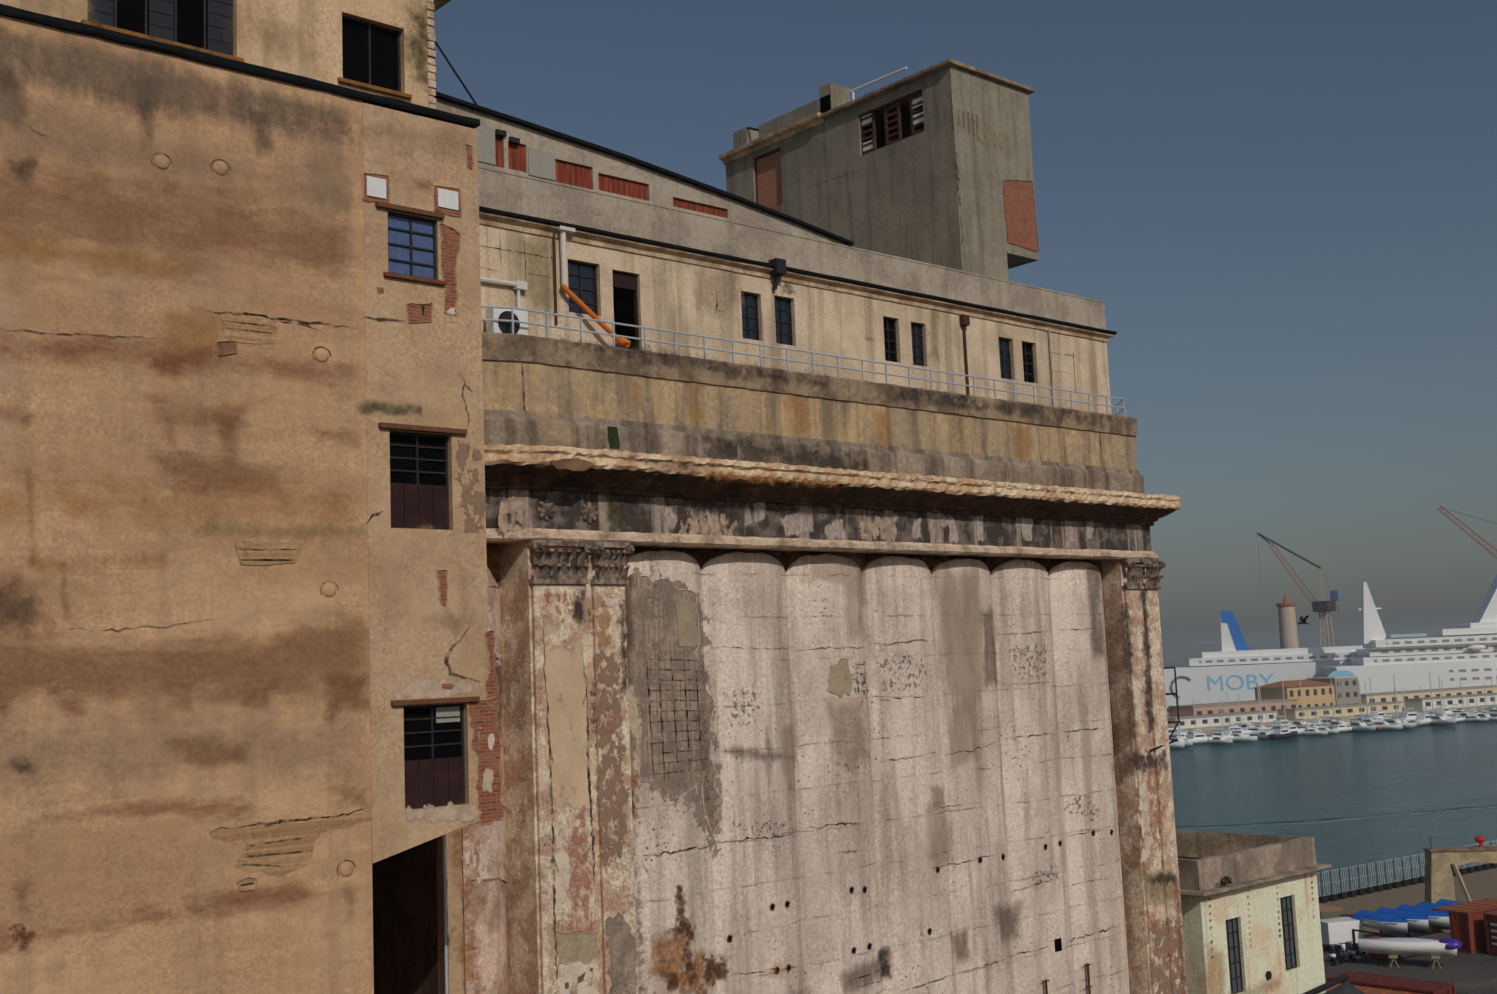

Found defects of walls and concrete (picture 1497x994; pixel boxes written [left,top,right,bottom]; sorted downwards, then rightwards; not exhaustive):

leakage [0,31,343,147]
spalling [405,185,462,324]
crack [4,329,164,339]
crack [185,305,403,330]
peeling [679,509,739,536]
crack [61,617,226,632]
crack [444,626,502,682]
leakage [946,575,997,760]
spalling [393,597,507,886]
spalling [541,560,795,994]
spalling [209,810,372,892]
rust [652,885,729,993]